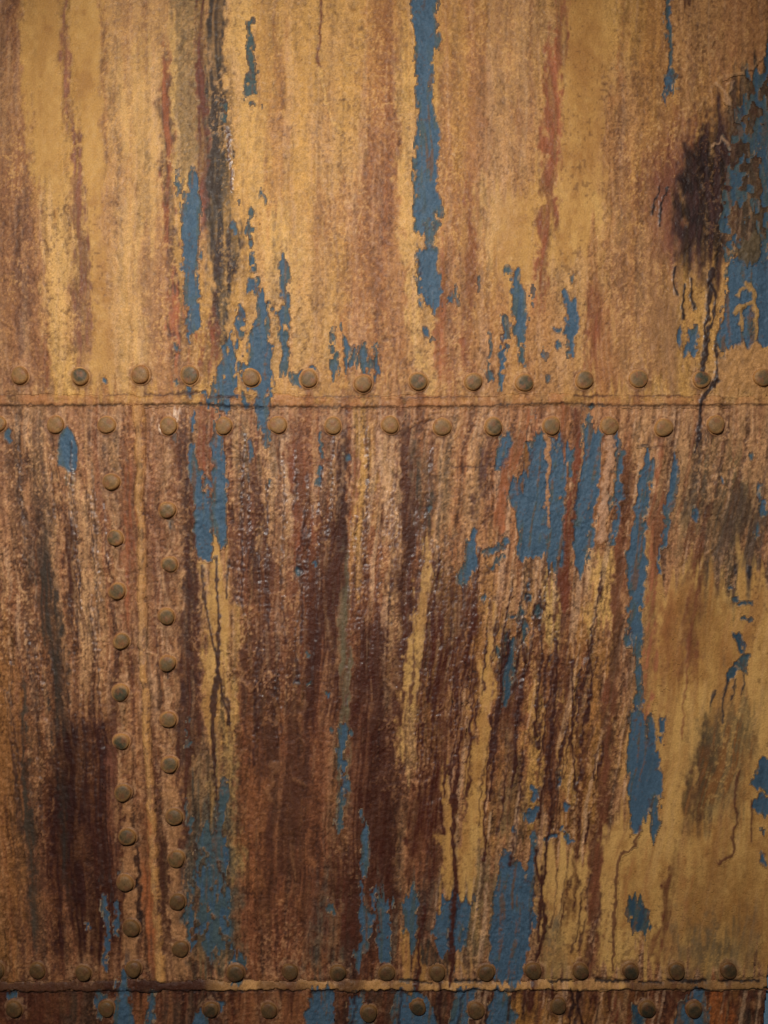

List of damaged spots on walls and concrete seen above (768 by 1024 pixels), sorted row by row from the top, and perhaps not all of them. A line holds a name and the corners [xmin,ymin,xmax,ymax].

rust [16,407,141,1002]
peeling [183,776,248,988]
peeling [172,165,382,563]
peeling [409,0,461,343]
rust [137,0,735,1024]
peeling [329,721,576,1024]
peeling [483,264,536,392]
peeling [540,273,581,384]
peeling [457,402,680,845]
peeling [675,324,700,360]
water stain [632,70,768,614]
peeling [713,41,768,352]